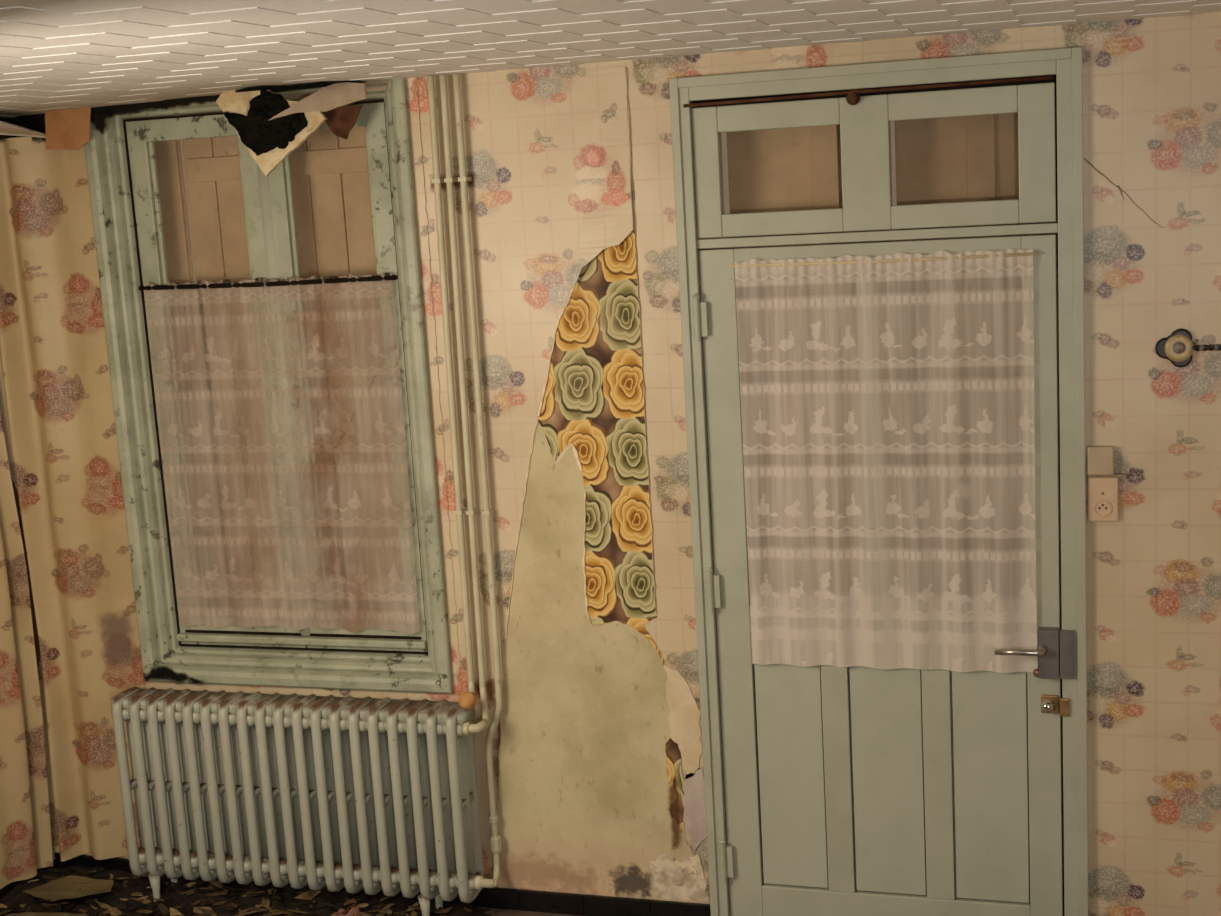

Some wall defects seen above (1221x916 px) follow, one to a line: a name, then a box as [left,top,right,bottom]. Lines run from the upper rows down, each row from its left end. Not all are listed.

flaking render [496,419,709,903]